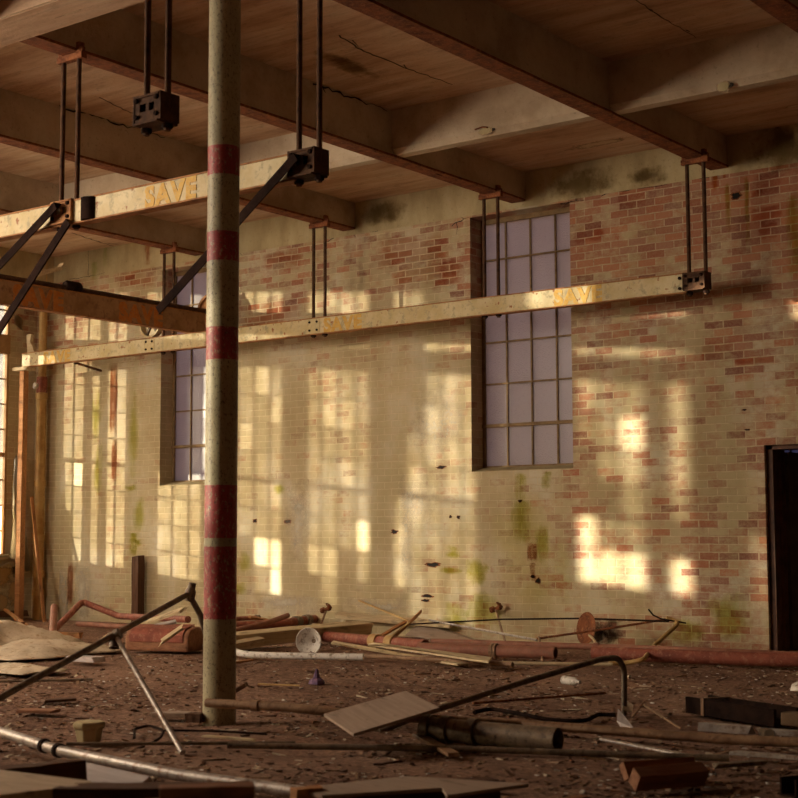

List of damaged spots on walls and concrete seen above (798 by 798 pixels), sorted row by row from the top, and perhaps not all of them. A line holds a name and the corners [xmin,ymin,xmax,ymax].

crack [339,35,453,85]
crack [313,83,388,112]